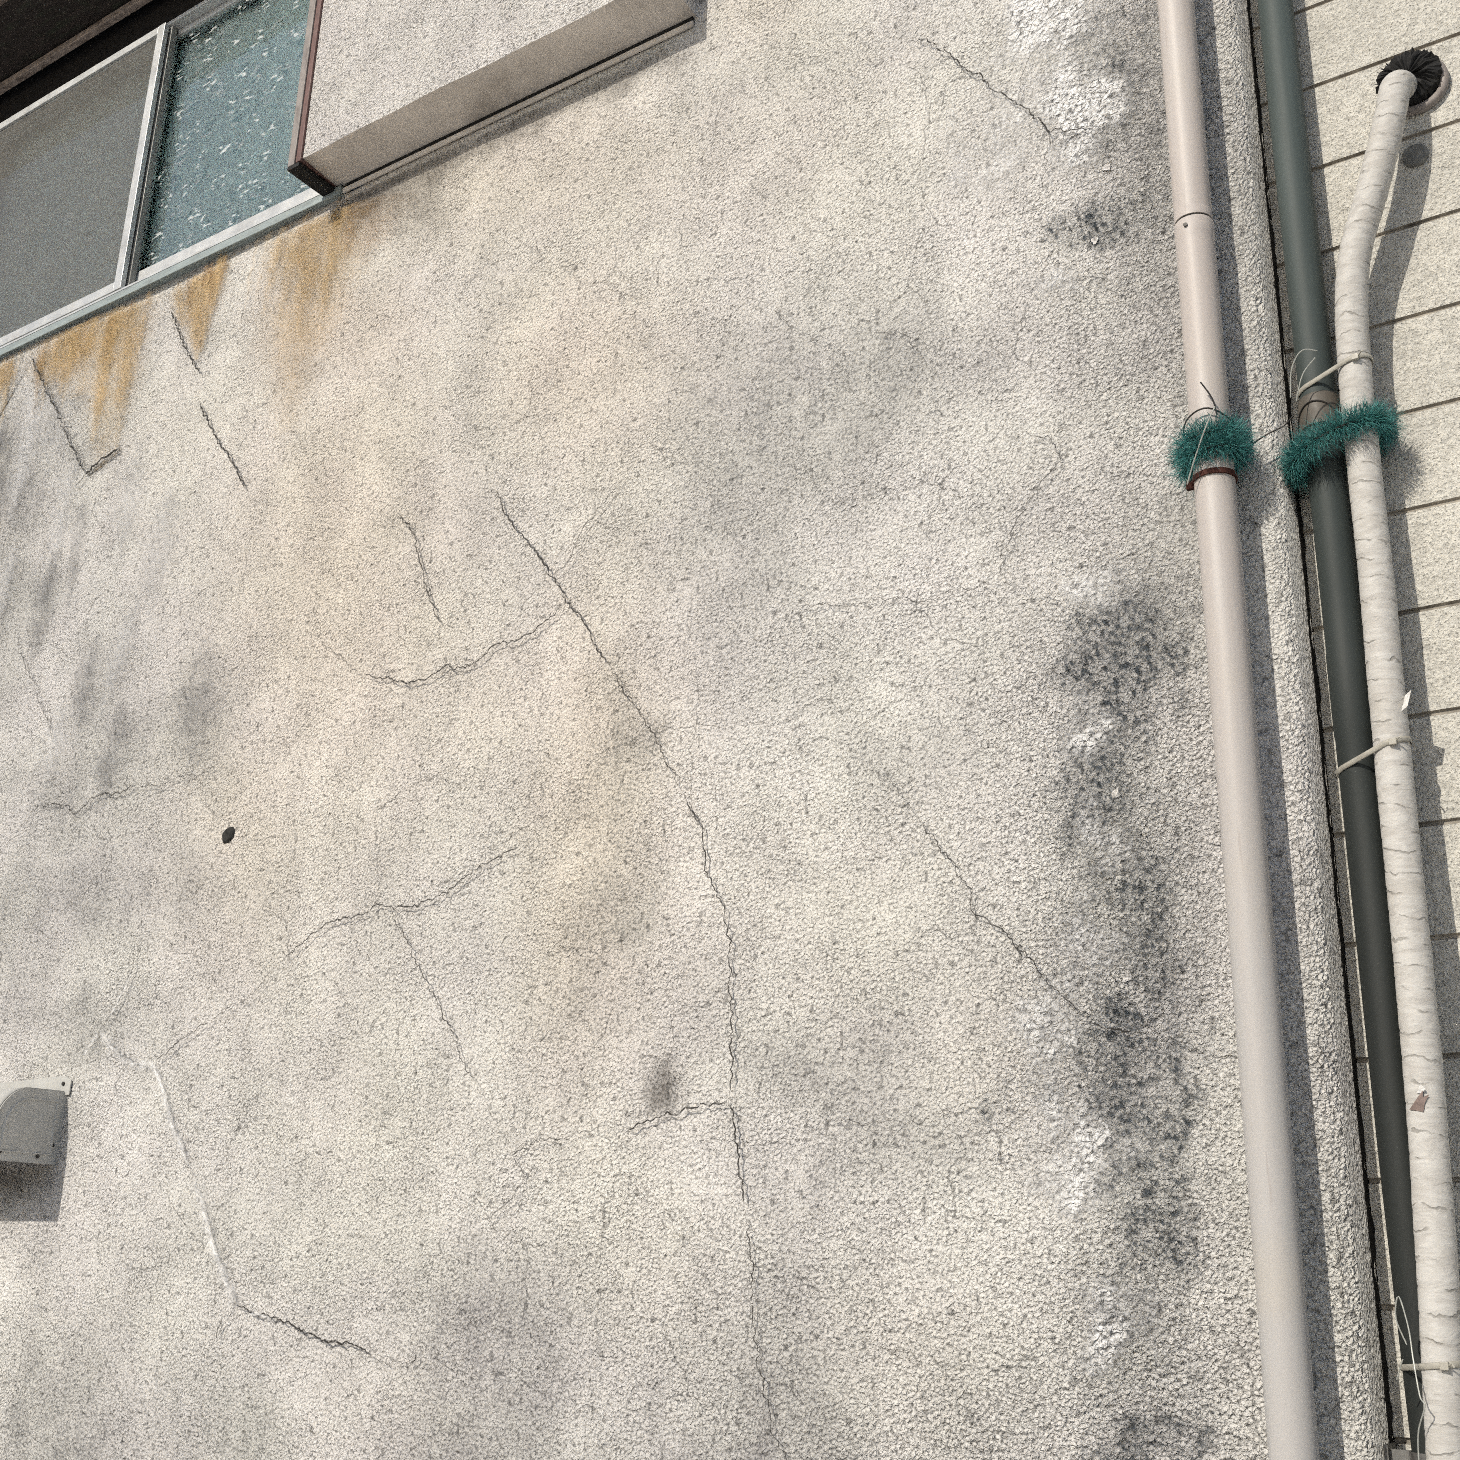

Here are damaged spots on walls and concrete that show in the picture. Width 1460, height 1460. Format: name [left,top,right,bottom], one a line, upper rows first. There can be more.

crack [908,6,1100,187]
crack [31,357,118,483]
crack [171,311,245,488]
damp [1051,590,1188,993]
crack [101,838,530,1077]
crack [324,489,788,1460]
crack [843,1094,983,1126]
damp [1074,999,1199,1266]
crack [216,1305,417,1365]
damp [1107,1415,1148,1460]